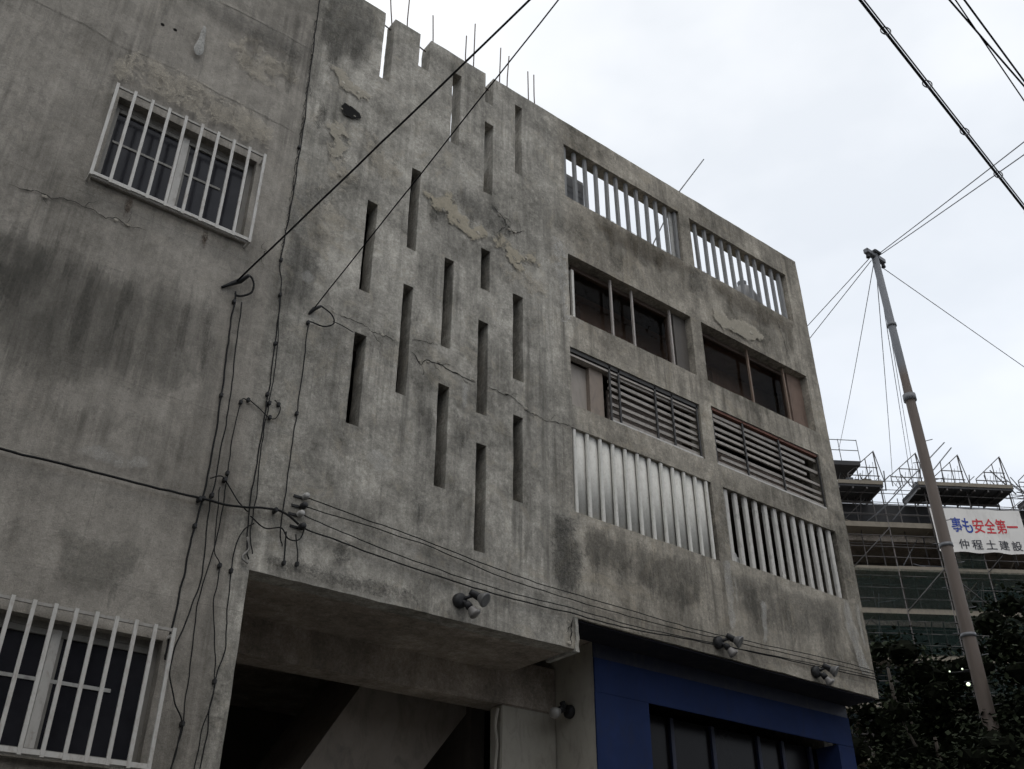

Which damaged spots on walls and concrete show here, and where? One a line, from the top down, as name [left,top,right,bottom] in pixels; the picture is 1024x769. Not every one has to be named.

spalling [325,103,363,183]
crack [10,184,142,229]
spalling [422,190,541,272]
spalling [713,309,764,341]
crack [330,306,568,426]